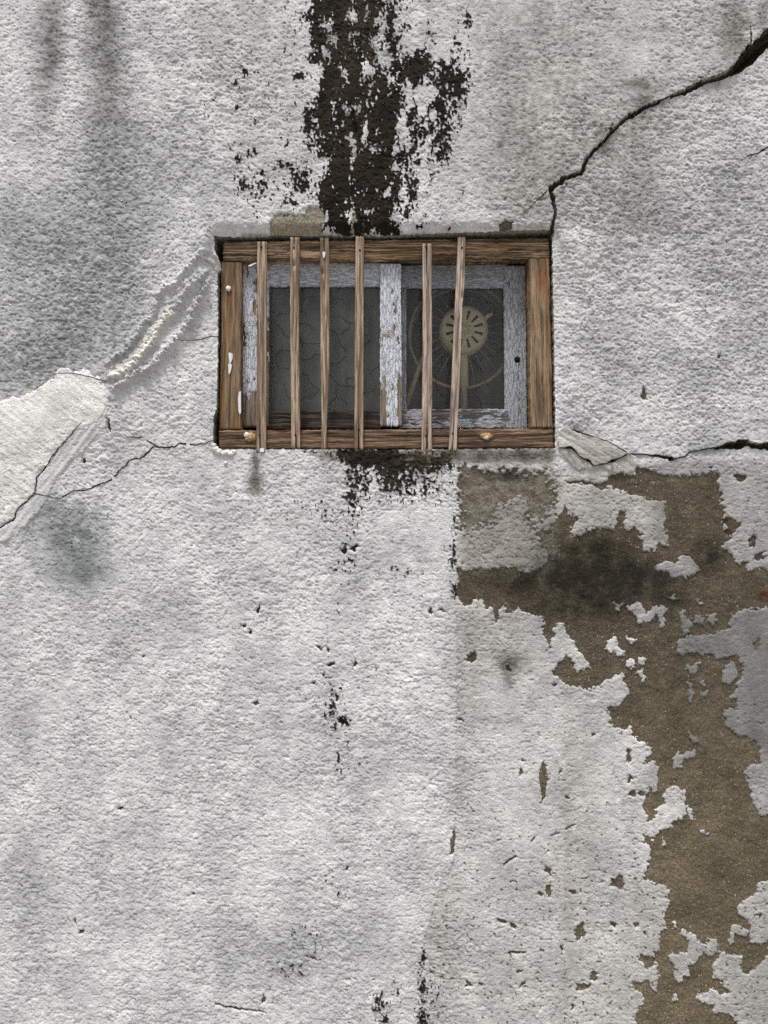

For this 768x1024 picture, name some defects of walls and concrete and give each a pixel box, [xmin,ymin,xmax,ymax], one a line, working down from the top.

damp [229,0,475,237]
crack [523,26,768,236]
crack [0,423,214,528]
damp [282,449,548,599]
damp [508,537,677,615]
crack [559,429,768,466]
flaking render [454,462,768,1024]